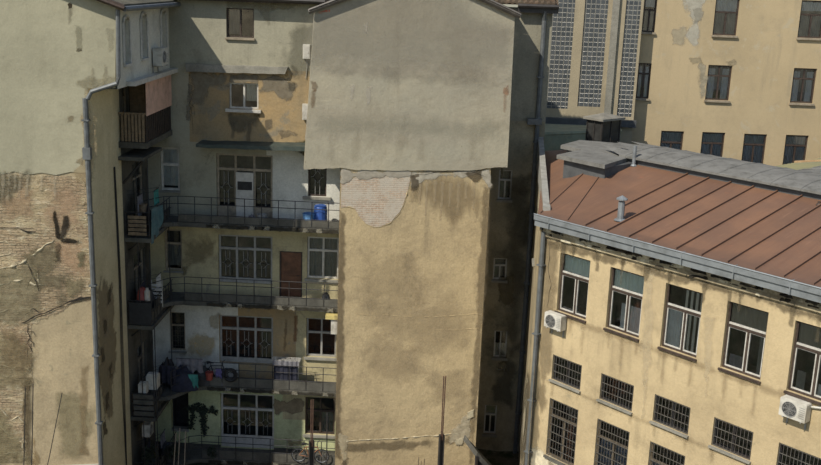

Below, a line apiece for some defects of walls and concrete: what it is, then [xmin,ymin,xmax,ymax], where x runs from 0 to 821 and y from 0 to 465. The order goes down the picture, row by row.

peeling [672,0,705,45]
peeling [186,72,296,121]
flaking render [340,168,492,228]
spalling [538,231,764,300]
crack [22,265,91,367]
flaking render [0,174,116,465]
spalling [770,293,821,318]
peeling [528,410,558,465]